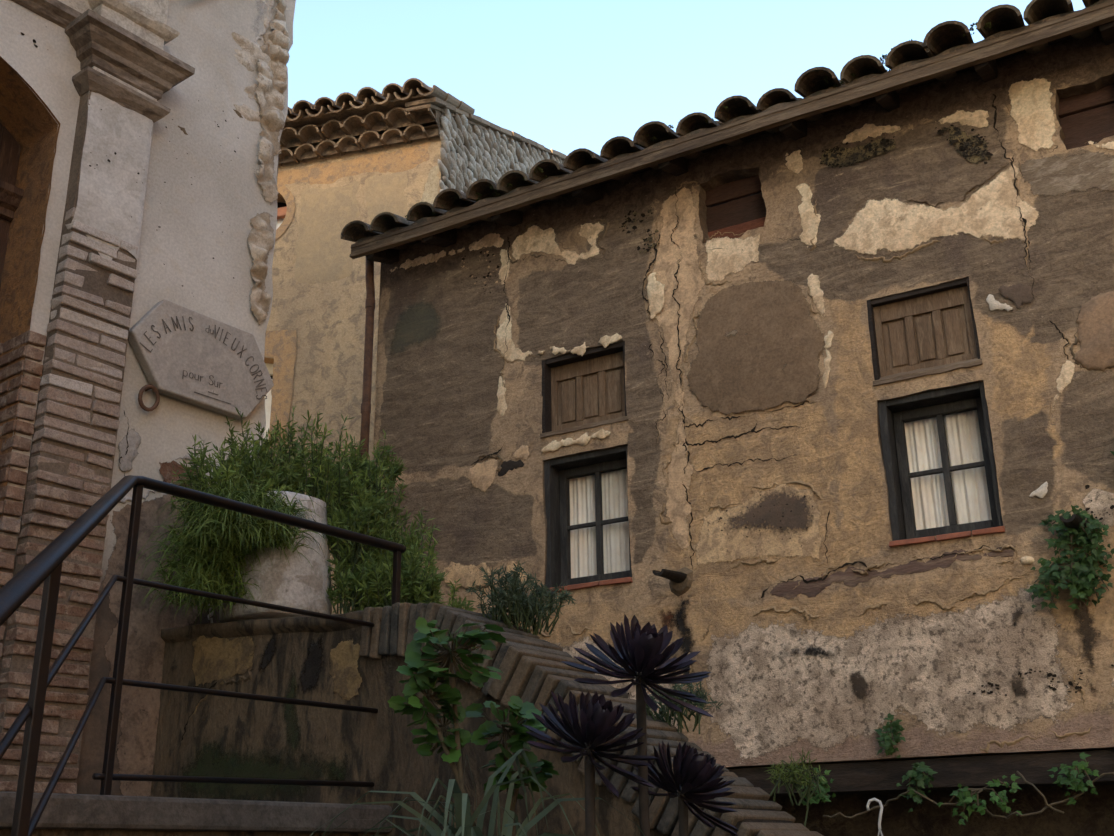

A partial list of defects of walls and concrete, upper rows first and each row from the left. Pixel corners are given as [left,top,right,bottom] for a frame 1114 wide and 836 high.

flaking render [935,110,989,128]
crack [992,94,1013,164]
flaking render [1006,78,1058,153]
flaking render [785,150,1039,312]
peeling [390,181,824,568]
crack [682,400,814,569]
flaking render [530,626,692,734]
damp [668,597,695,685]
damp [783,647,831,658]
damp [850,671,869,699]
flaking render [703,556,1091,764]
damp [1012,670,1028,696]